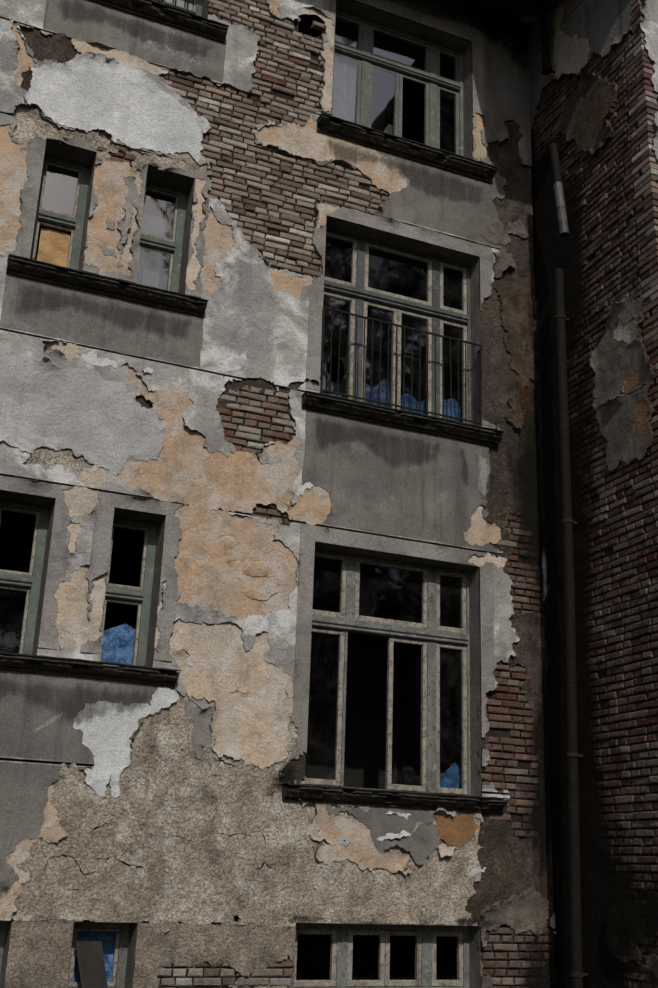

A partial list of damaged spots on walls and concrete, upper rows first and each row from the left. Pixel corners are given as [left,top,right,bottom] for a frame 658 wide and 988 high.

flaking render [0,0,410,300]
flaking render [0,112,556,988]
flaking render [532,0,658,903]
crack [174,826,276,869]
flaking render [616,930,658,988]